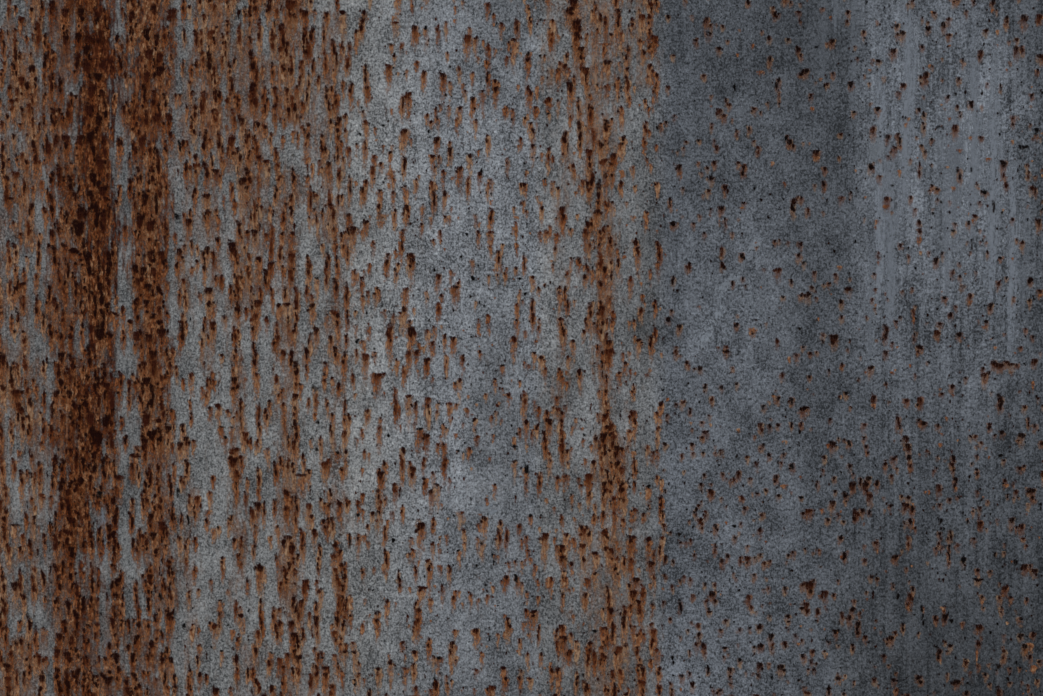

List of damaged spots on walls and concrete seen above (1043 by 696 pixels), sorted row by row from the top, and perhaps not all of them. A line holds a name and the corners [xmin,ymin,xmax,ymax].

rust [719,0,1043,696]